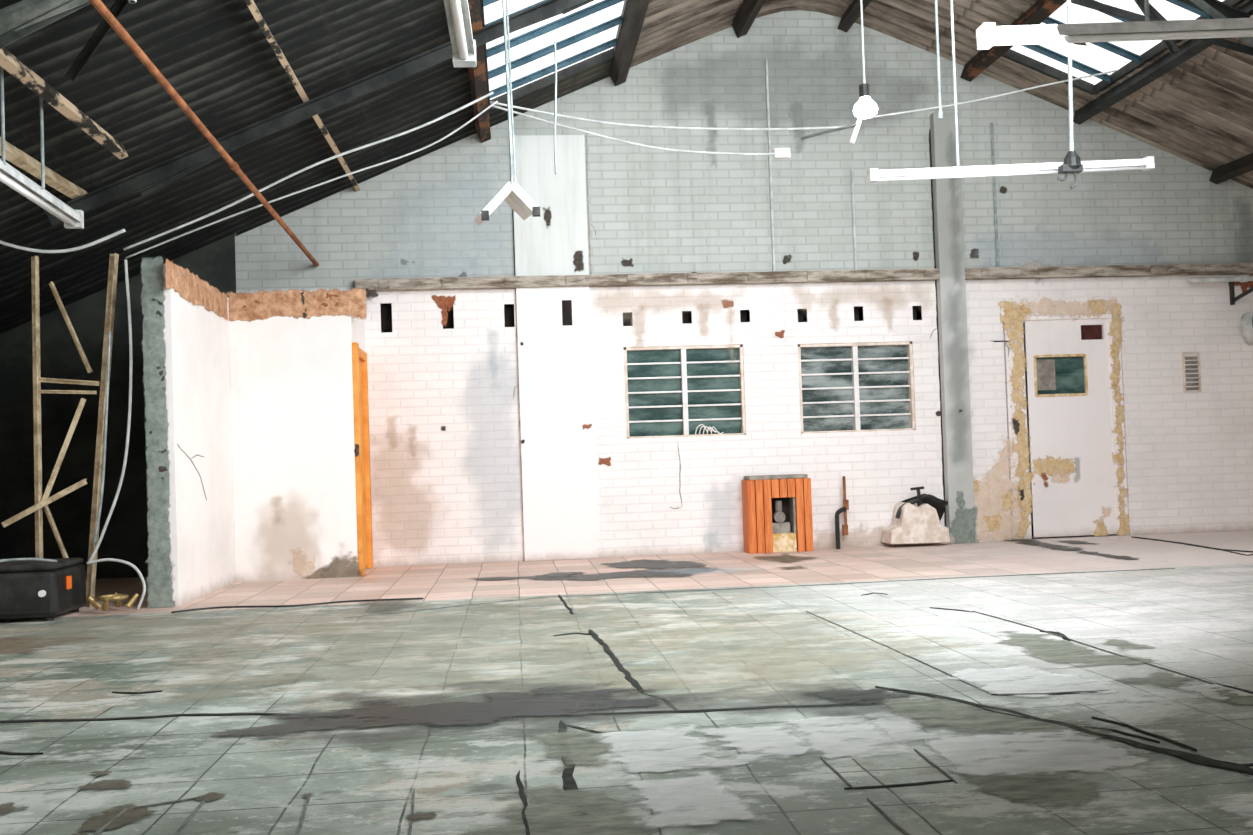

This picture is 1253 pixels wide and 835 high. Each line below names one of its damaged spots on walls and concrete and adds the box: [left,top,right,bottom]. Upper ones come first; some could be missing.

spalling [623,313,633,326]
spalling [141,257,392,608]
flaking render [973,296,1130,541]
crack [0,690,386,755]
leakage [523,683,635,700]
crack [343,537,1253,813]
crack [516,770,530,835]
crack [820,749,957,835]